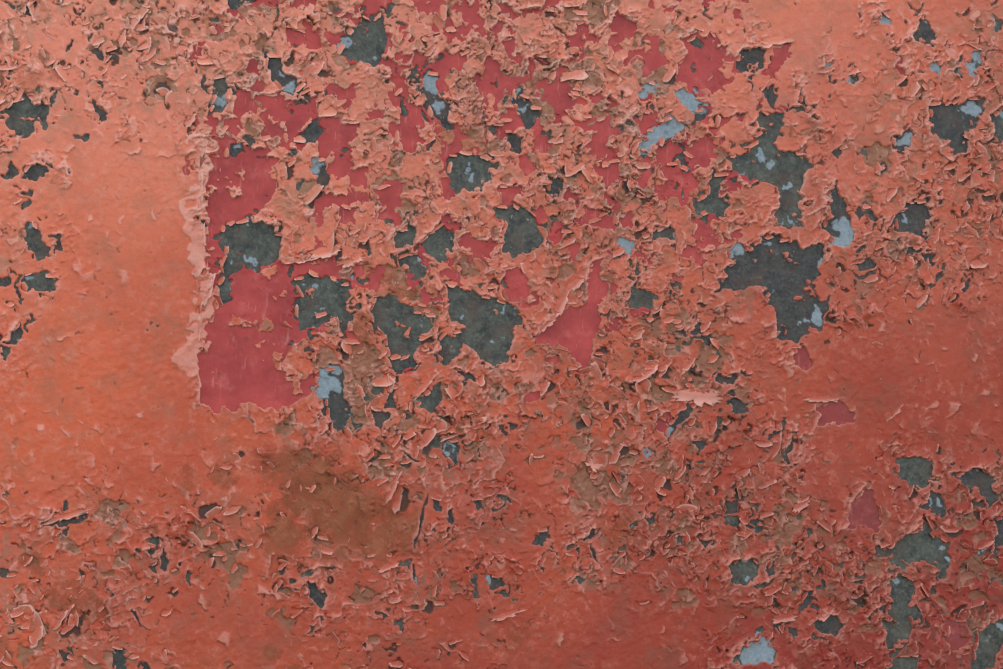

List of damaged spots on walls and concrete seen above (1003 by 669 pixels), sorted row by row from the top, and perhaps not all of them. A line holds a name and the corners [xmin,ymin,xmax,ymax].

peeling [0,30,61,157]
peeling [92,100,108,122]
peeling [89,0,283,106]
peeling [22,164,49,181]
peeling [3,322,26,345]
peeling [0,221,59,307]
peeling [194,0,1003,601]
peeling [3,556,86,649]
peeling [21,508,95,536]
peeling [176,505,264,574]
peeling [271,526,339,620]
peeling [59,636,150,669]